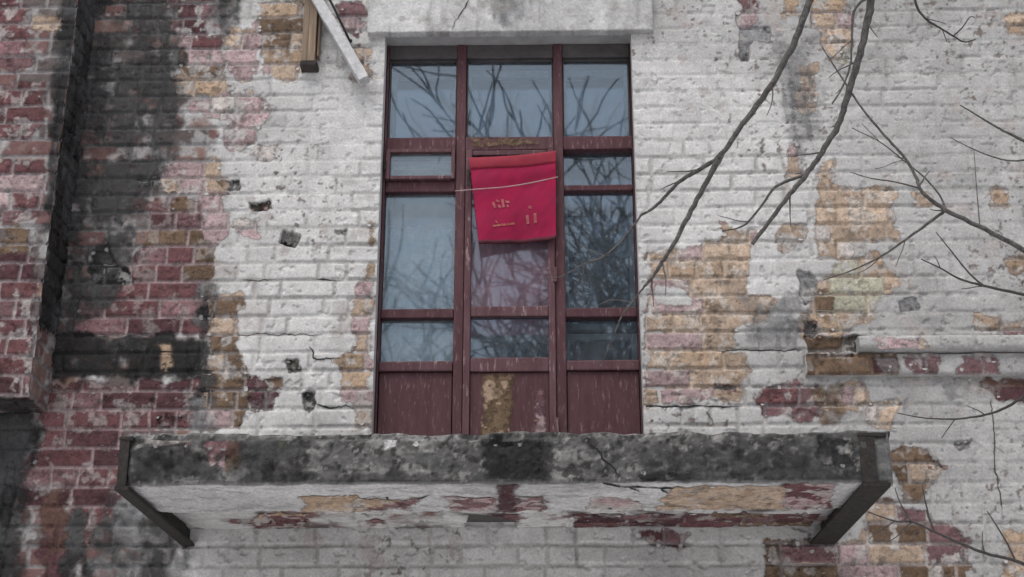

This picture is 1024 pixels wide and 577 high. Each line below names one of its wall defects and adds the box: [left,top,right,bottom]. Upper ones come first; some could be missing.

peeling [0,0,62,143]
water stain [53,51,97,354]
peeling [0,156,50,397]
peeling [19,0,305,549]
crack [238,332,340,362]
peeling [248,494,419,529]
crack [317,401,353,409]
water stain [484,439,553,479]
crack [587,437,682,494]
peeling [566,445,973,577]
peeling [643,159,942,431]
peeling [956,352,1024,403]